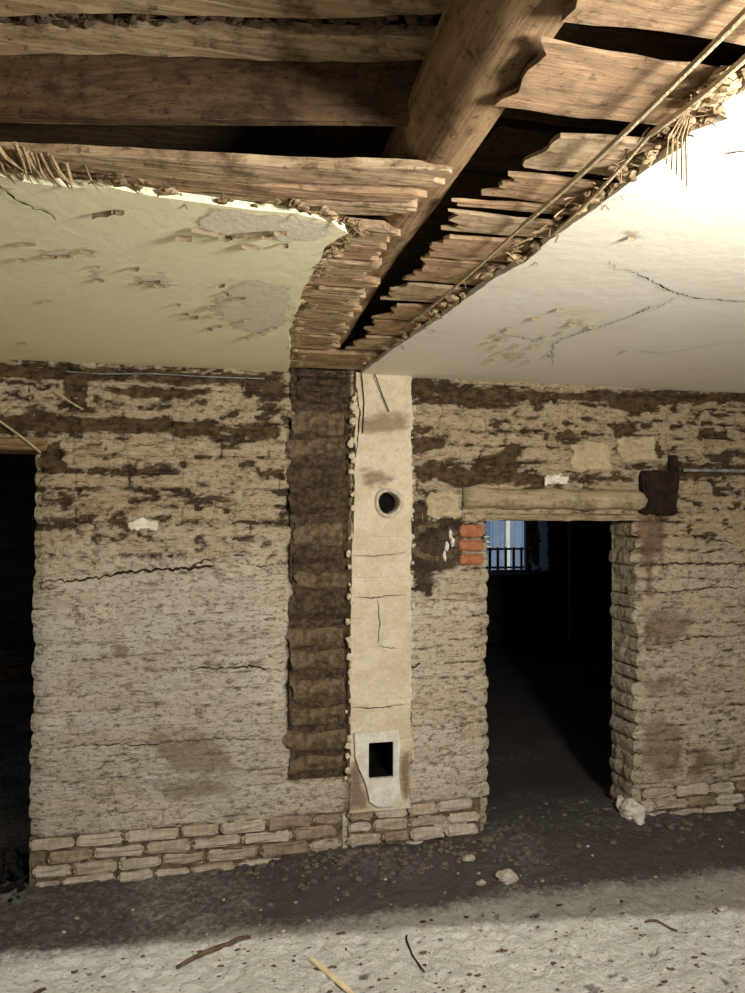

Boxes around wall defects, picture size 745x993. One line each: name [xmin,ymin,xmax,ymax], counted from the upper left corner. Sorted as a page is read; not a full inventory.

crack [0,186,56,220]
peeling [92,210,124,220]
peeling [175,209,334,250]
peeling [17,242,104,283]
peeling [129,267,178,289]
peeling [175,279,296,341]
crack [496,262,745,367]
spalling [411,380,745,562]
peeling [528,521,549,571]
crack [40,558,221,590]
spalling [0,362,349,780]